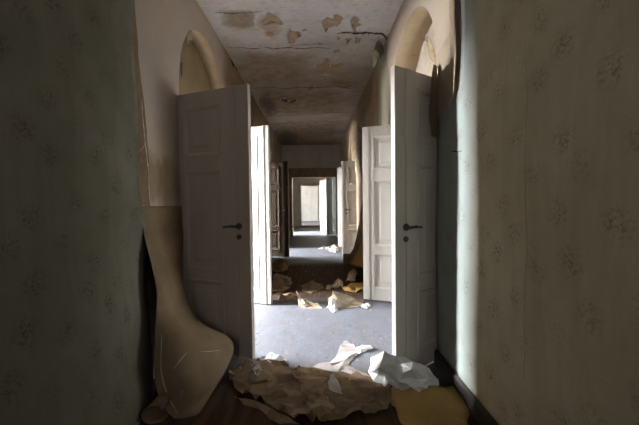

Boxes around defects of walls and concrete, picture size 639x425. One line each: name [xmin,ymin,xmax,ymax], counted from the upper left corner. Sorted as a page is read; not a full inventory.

water stain [212,6,263,32]
peeling [262,12,283,37]
peeling [321,15,362,44]
crack [229,32,387,71]